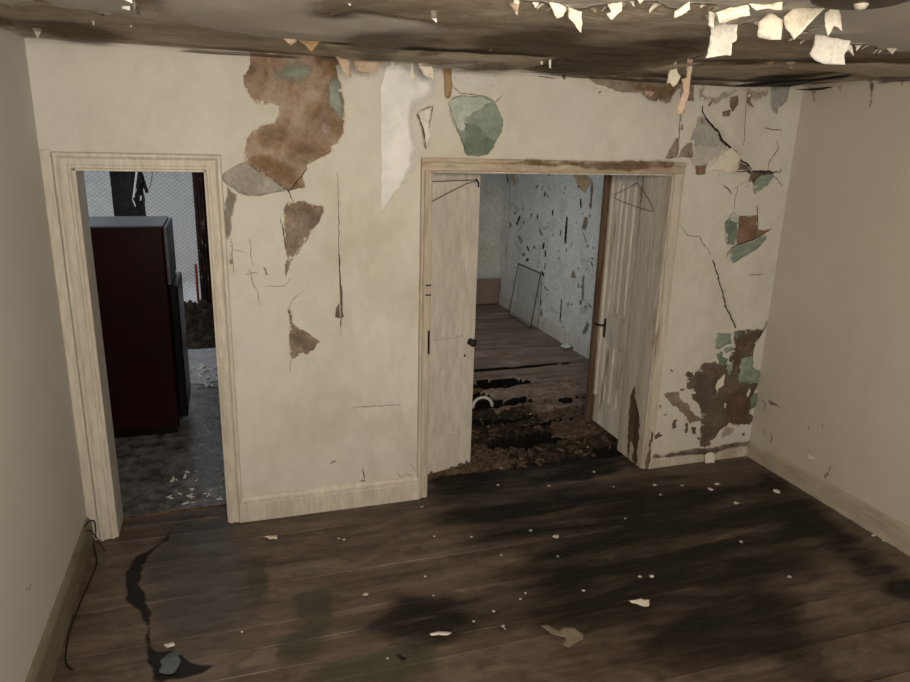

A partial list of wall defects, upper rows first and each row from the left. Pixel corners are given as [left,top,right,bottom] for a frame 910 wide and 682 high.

water stain [22,22,115,44]
water stain [376,0,515,24]
peeling [532,0,661,32]
water stain [475,31,728,86]
peeling [674,1,897,65]
water stain [870,77,910,91]
flaking render [241,38,395,275]
crack [665,101,781,169]
crack [333,173,344,336]
crack [680,225,739,328]
flaking render [723,208,772,264]
flaking render [659,321,767,448]